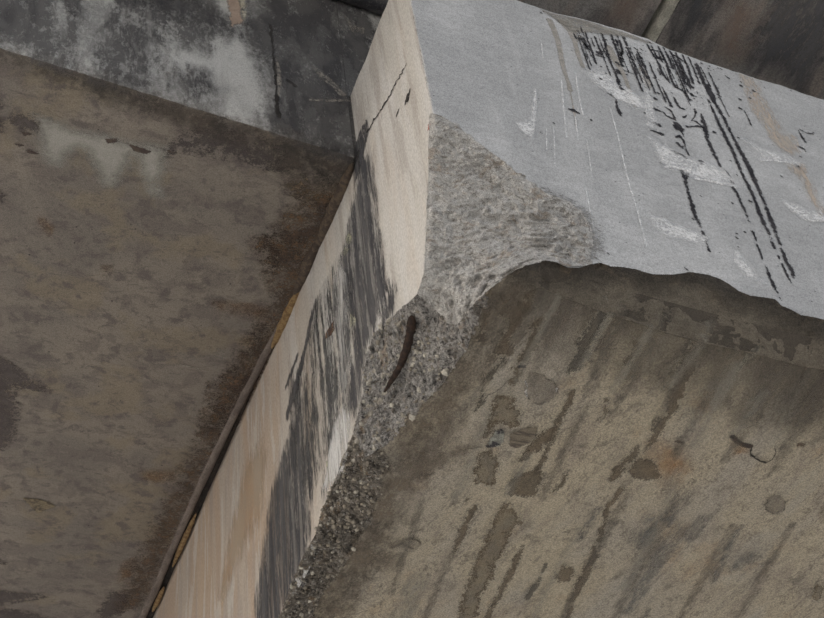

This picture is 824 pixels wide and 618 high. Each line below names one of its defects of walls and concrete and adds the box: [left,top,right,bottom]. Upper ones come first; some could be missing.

crack [269,24,297,118]
crack [366,65,410,133]
damp [516,0,824,301]
damp [0,0,397,618]
damp [473,288,547,439]
spalling [278,113,824,618]
damp [566,311,609,374]
damp [452,497,479,553]
damp [458,389,576,618]
damp [555,359,710,618]
crack [730,435,776,463]